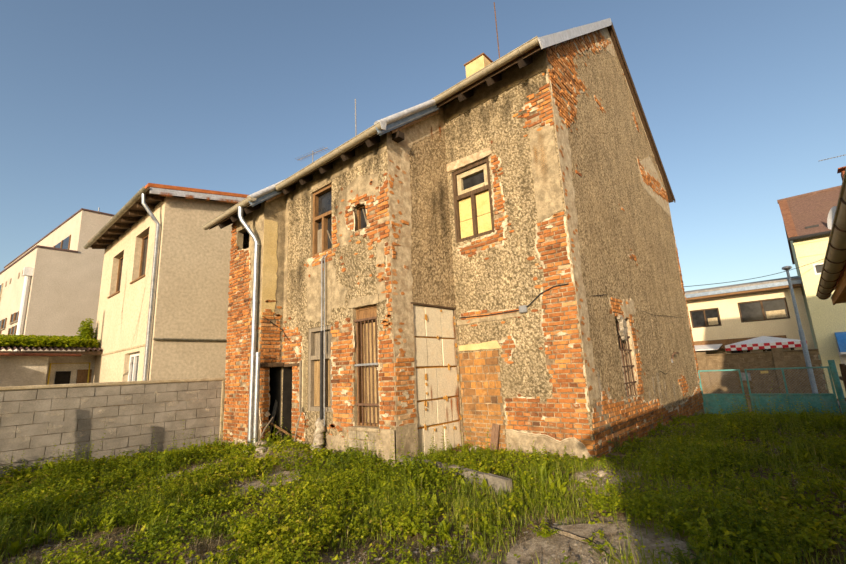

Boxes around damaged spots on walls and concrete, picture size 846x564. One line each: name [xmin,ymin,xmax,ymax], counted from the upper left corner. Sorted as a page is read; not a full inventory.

flaking render [513,30,613,137]
flaking render [622,70,669,205]
flaking render [456,155,514,260]
flaking render [223,223,309,444]
flaking render [304,160,416,438]
flaking render [460,309,521,326]
flaking render [498,334,517,365]
flaking render [504,206,704,458]